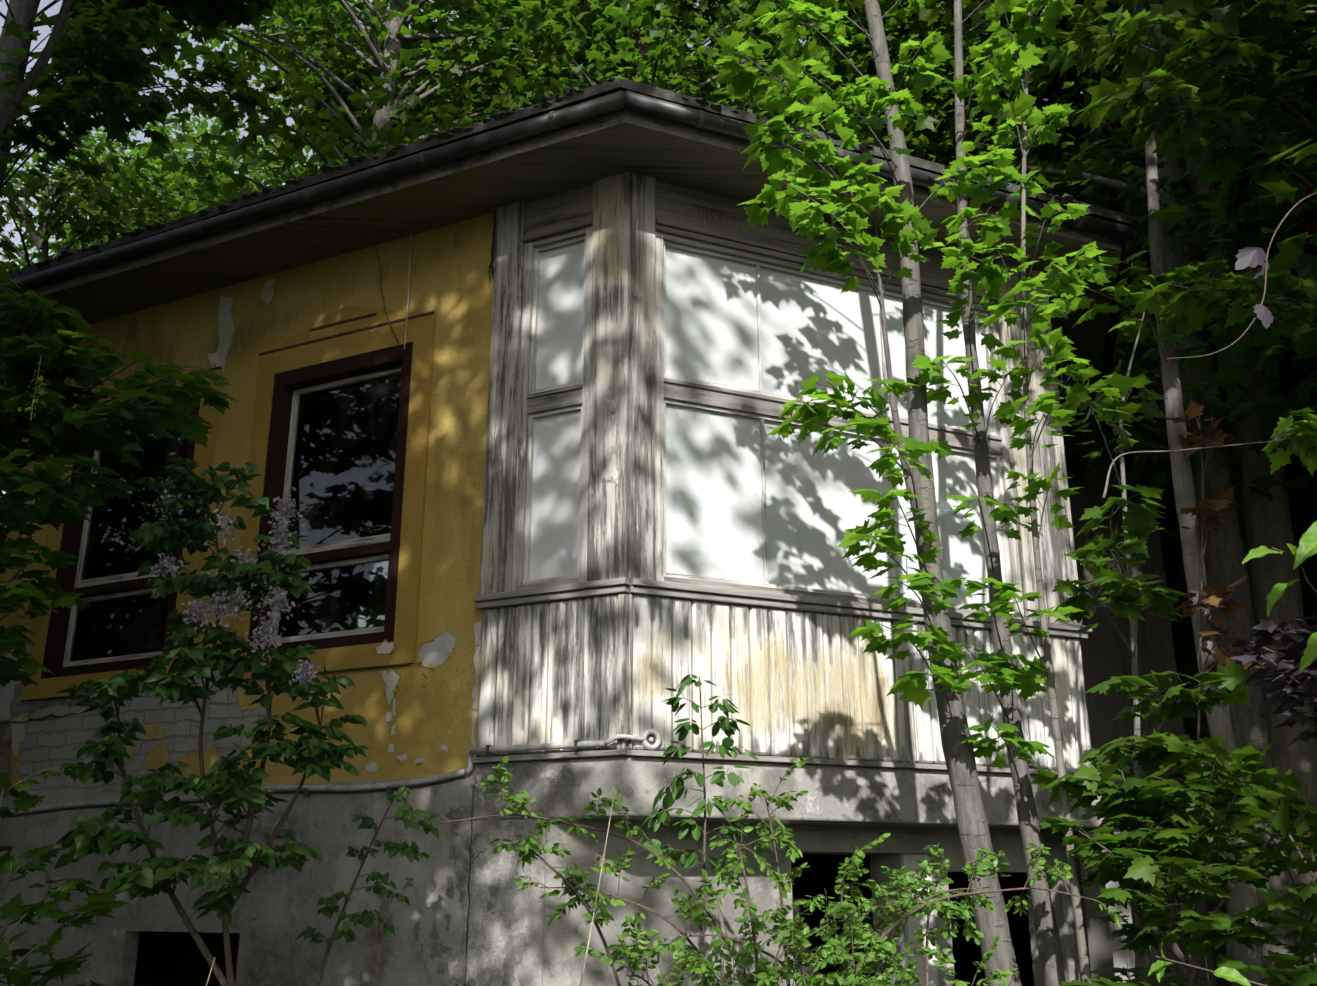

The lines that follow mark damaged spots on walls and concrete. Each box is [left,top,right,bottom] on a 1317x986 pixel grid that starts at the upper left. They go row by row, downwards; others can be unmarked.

peeling [207,293,235,373]
peeling [417,631,457,669]
leakage [634,596,714,638]
leakage [731,604,880,659]
flaking render [0,646,267,806]
peeling [373,640,423,764]